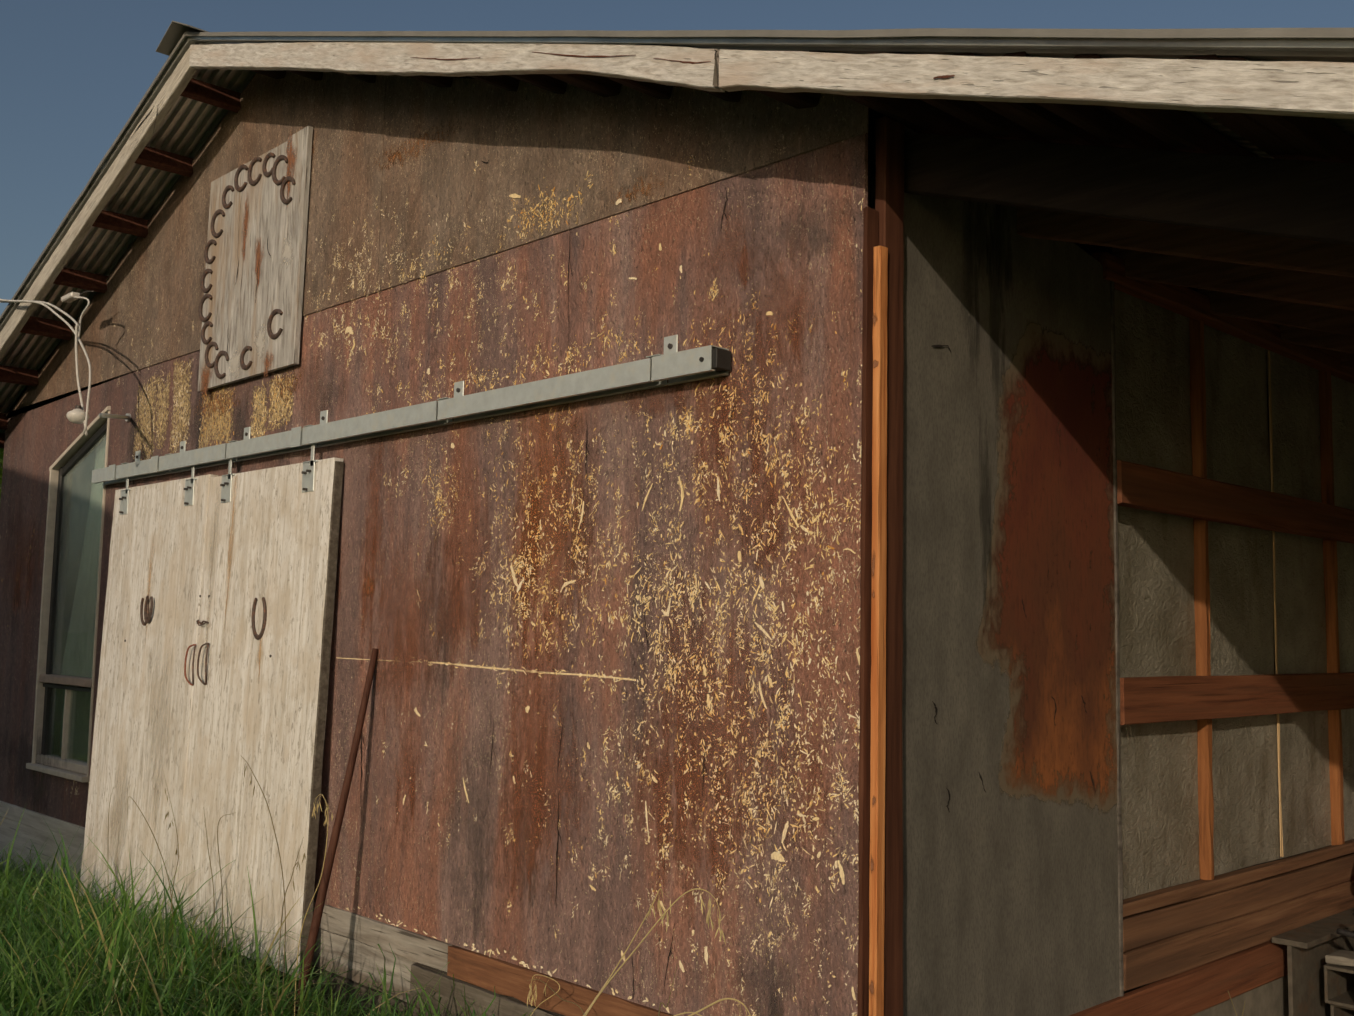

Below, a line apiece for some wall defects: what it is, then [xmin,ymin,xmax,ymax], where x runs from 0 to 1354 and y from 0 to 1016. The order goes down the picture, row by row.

corrosion [522,503,540,640]
corrosion [655,743,697,855]
corrosion [711,778,731,891]